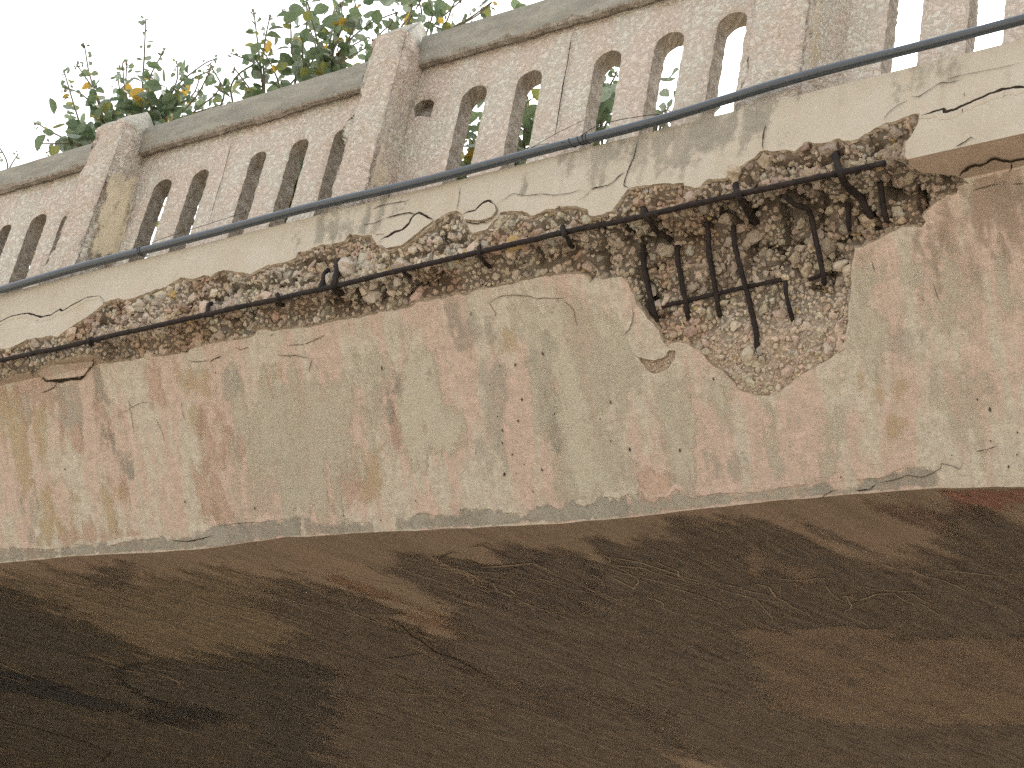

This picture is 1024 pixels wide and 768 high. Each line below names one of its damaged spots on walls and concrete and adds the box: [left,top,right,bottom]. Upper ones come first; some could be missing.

crack [0,296,104,325]
crack [364,200,433,245]
spalling [0,113,968,409]
crack [457,142,638,224]
crack [884,63,1024,190]
crack [37,359,94,393]
leakage [223,353,374,527]
leakage [372,344,466,473]
leakage [512,294,640,504]
leakage [657,372,710,490]